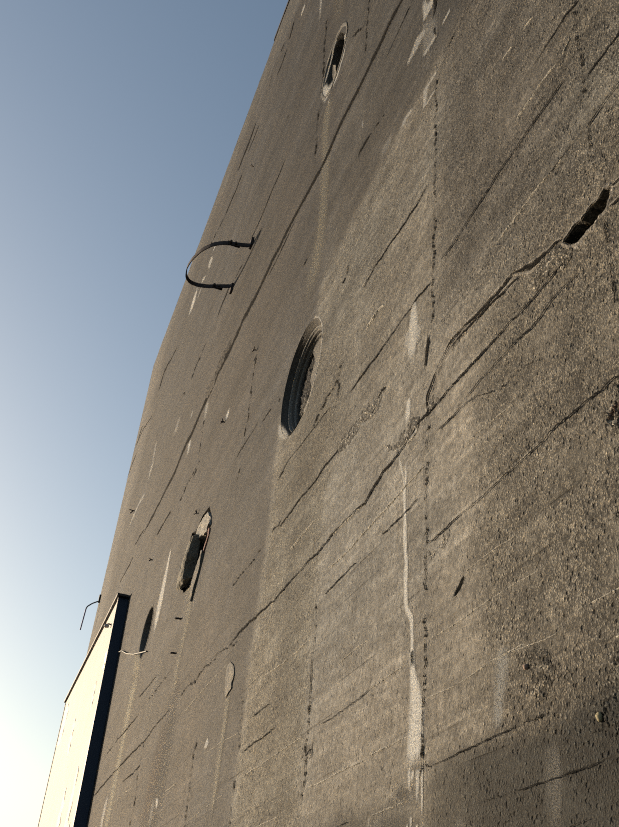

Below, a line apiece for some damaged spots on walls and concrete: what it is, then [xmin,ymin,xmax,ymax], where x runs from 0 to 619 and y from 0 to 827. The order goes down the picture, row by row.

crack [122,0,408,578]
crack [181,0,619,779]
spalling [603,378,619,436]
spalling [190,512,212,602]
crack [93,672,169,826]
crack [229,700,273,822]
crack [299,562,368,823]
leakage [399,460,423,809]
crack [480,761,600,802]
spalling [583,632,619,737]